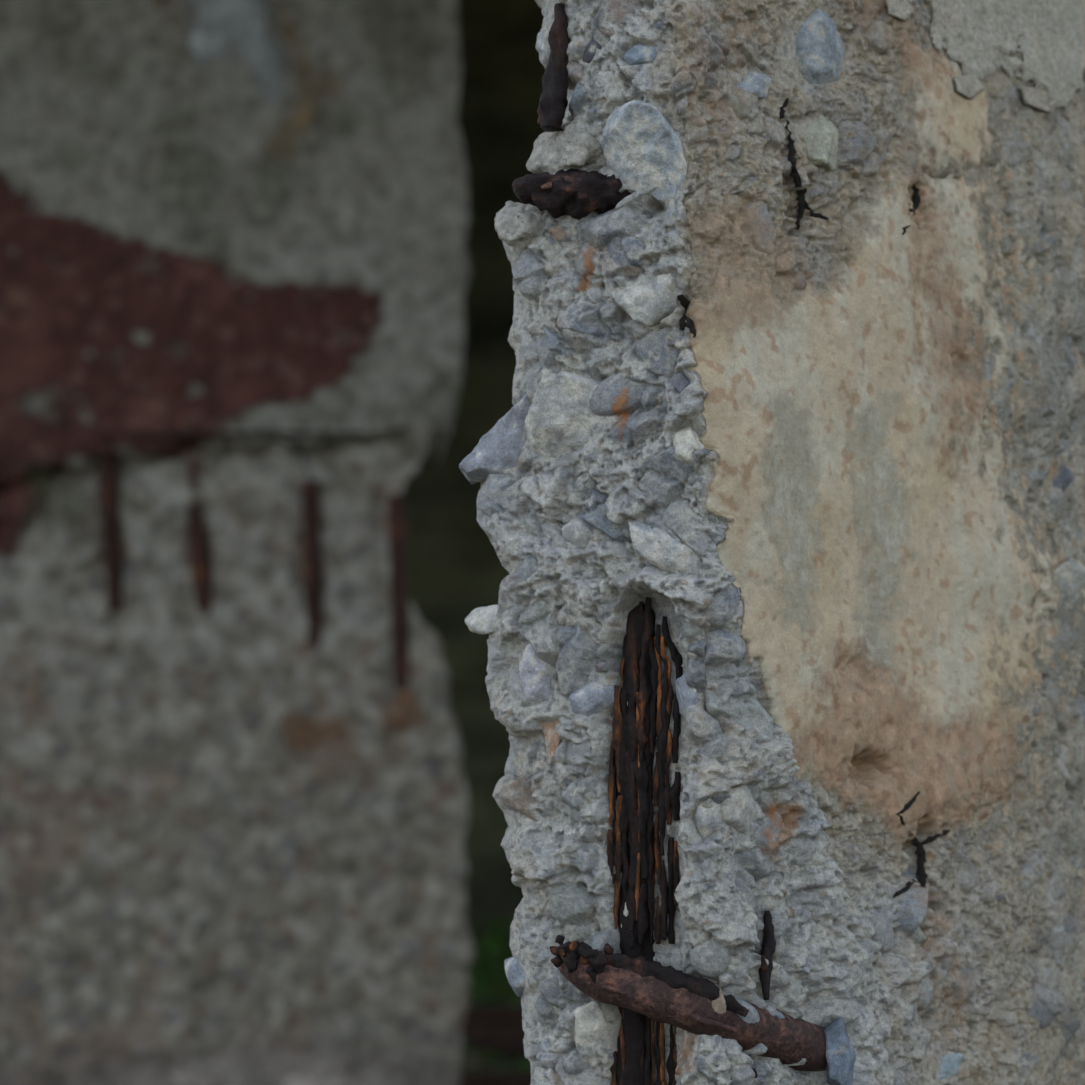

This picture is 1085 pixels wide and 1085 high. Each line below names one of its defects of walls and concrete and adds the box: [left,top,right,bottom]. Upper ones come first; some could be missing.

flaking render [925,0,1085,113]
crack [779,98,829,230]
rust [0,174,384,556]
spalling [459,0,988,1085]
crack [893,791,950,899]